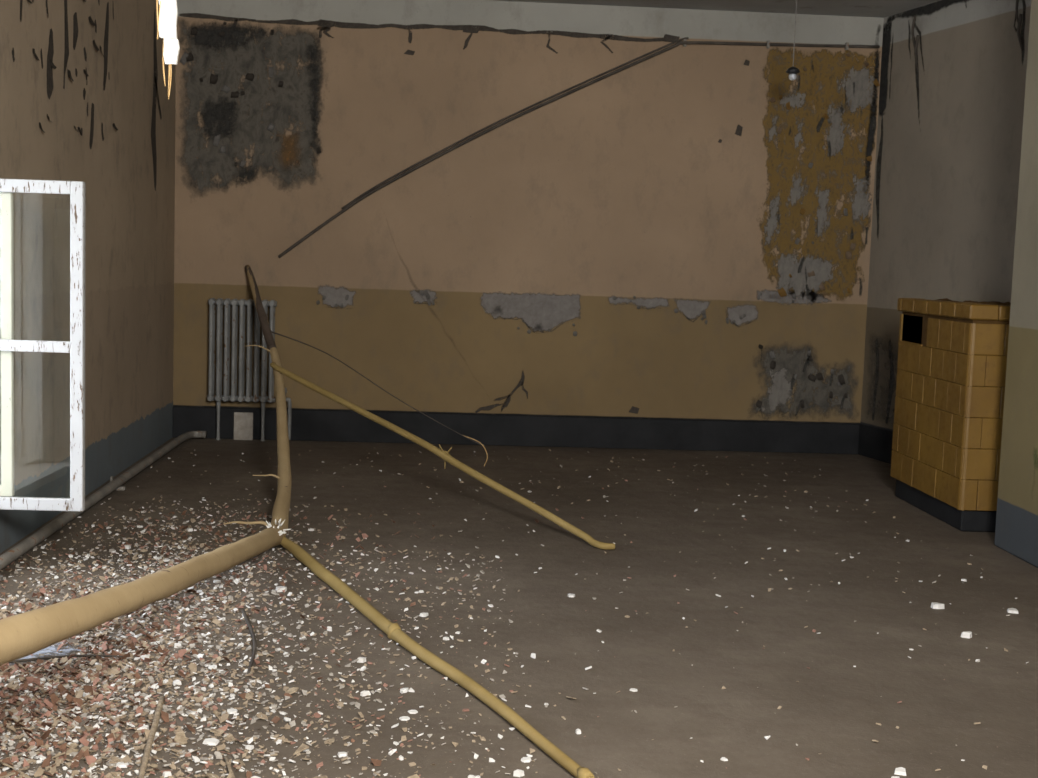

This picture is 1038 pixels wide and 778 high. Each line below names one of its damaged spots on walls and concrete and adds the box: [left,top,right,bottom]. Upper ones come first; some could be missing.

peeling [20,0,118,149]
damp [867,339,898,424]